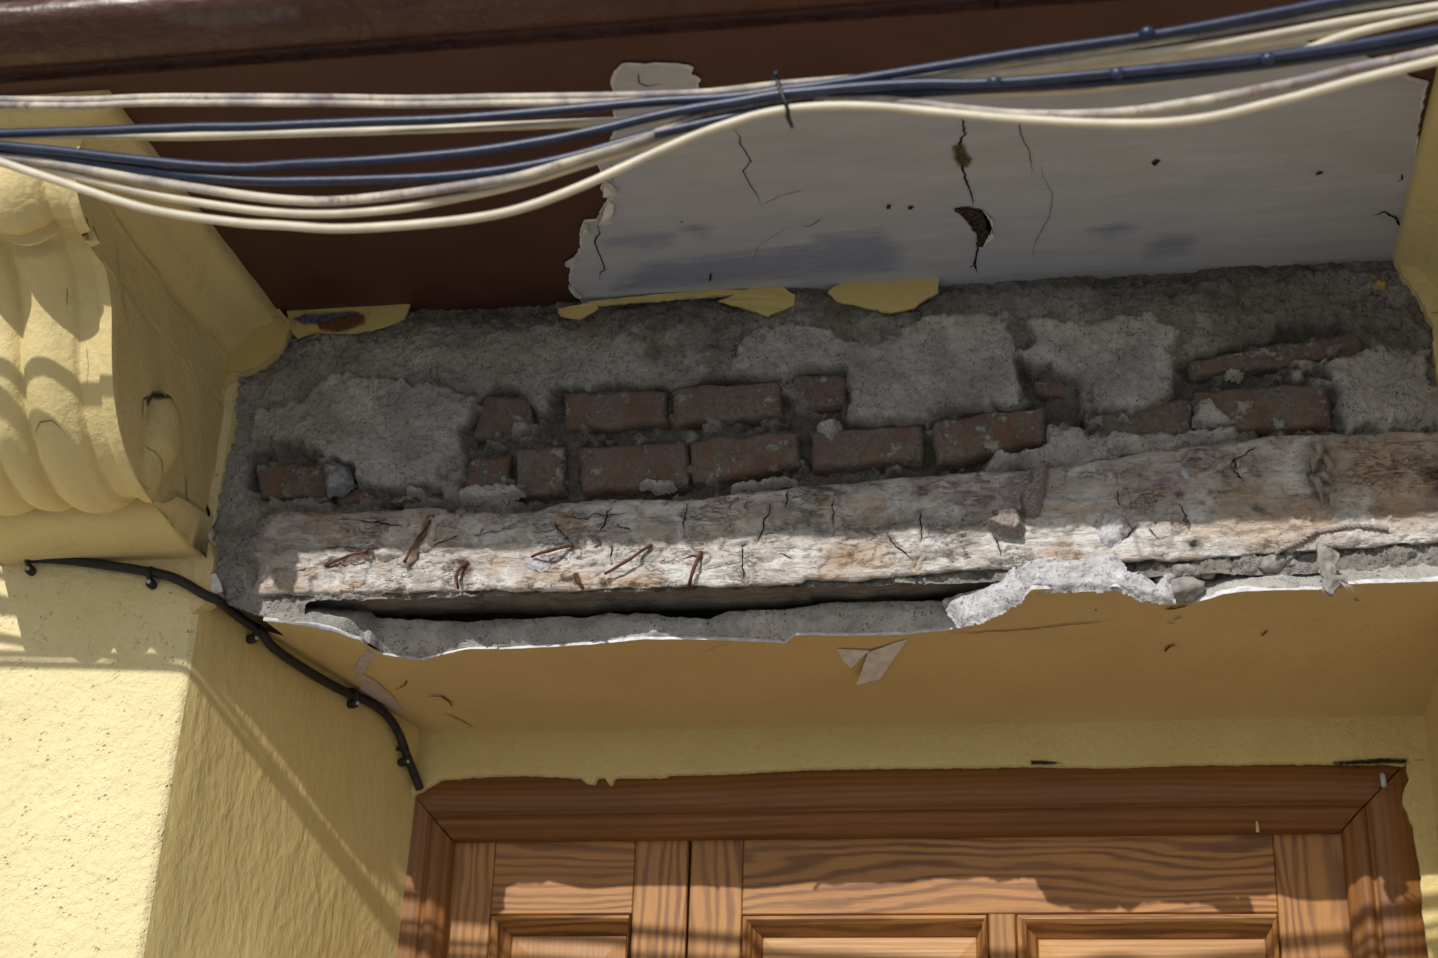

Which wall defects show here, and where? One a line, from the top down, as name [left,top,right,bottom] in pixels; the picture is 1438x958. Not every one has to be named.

crack [958,119,974,206]
rust [318,315,364,332]
spalling [186,56,1438,715]
crack [682,492,792,579]
crack [886,513,922,567]